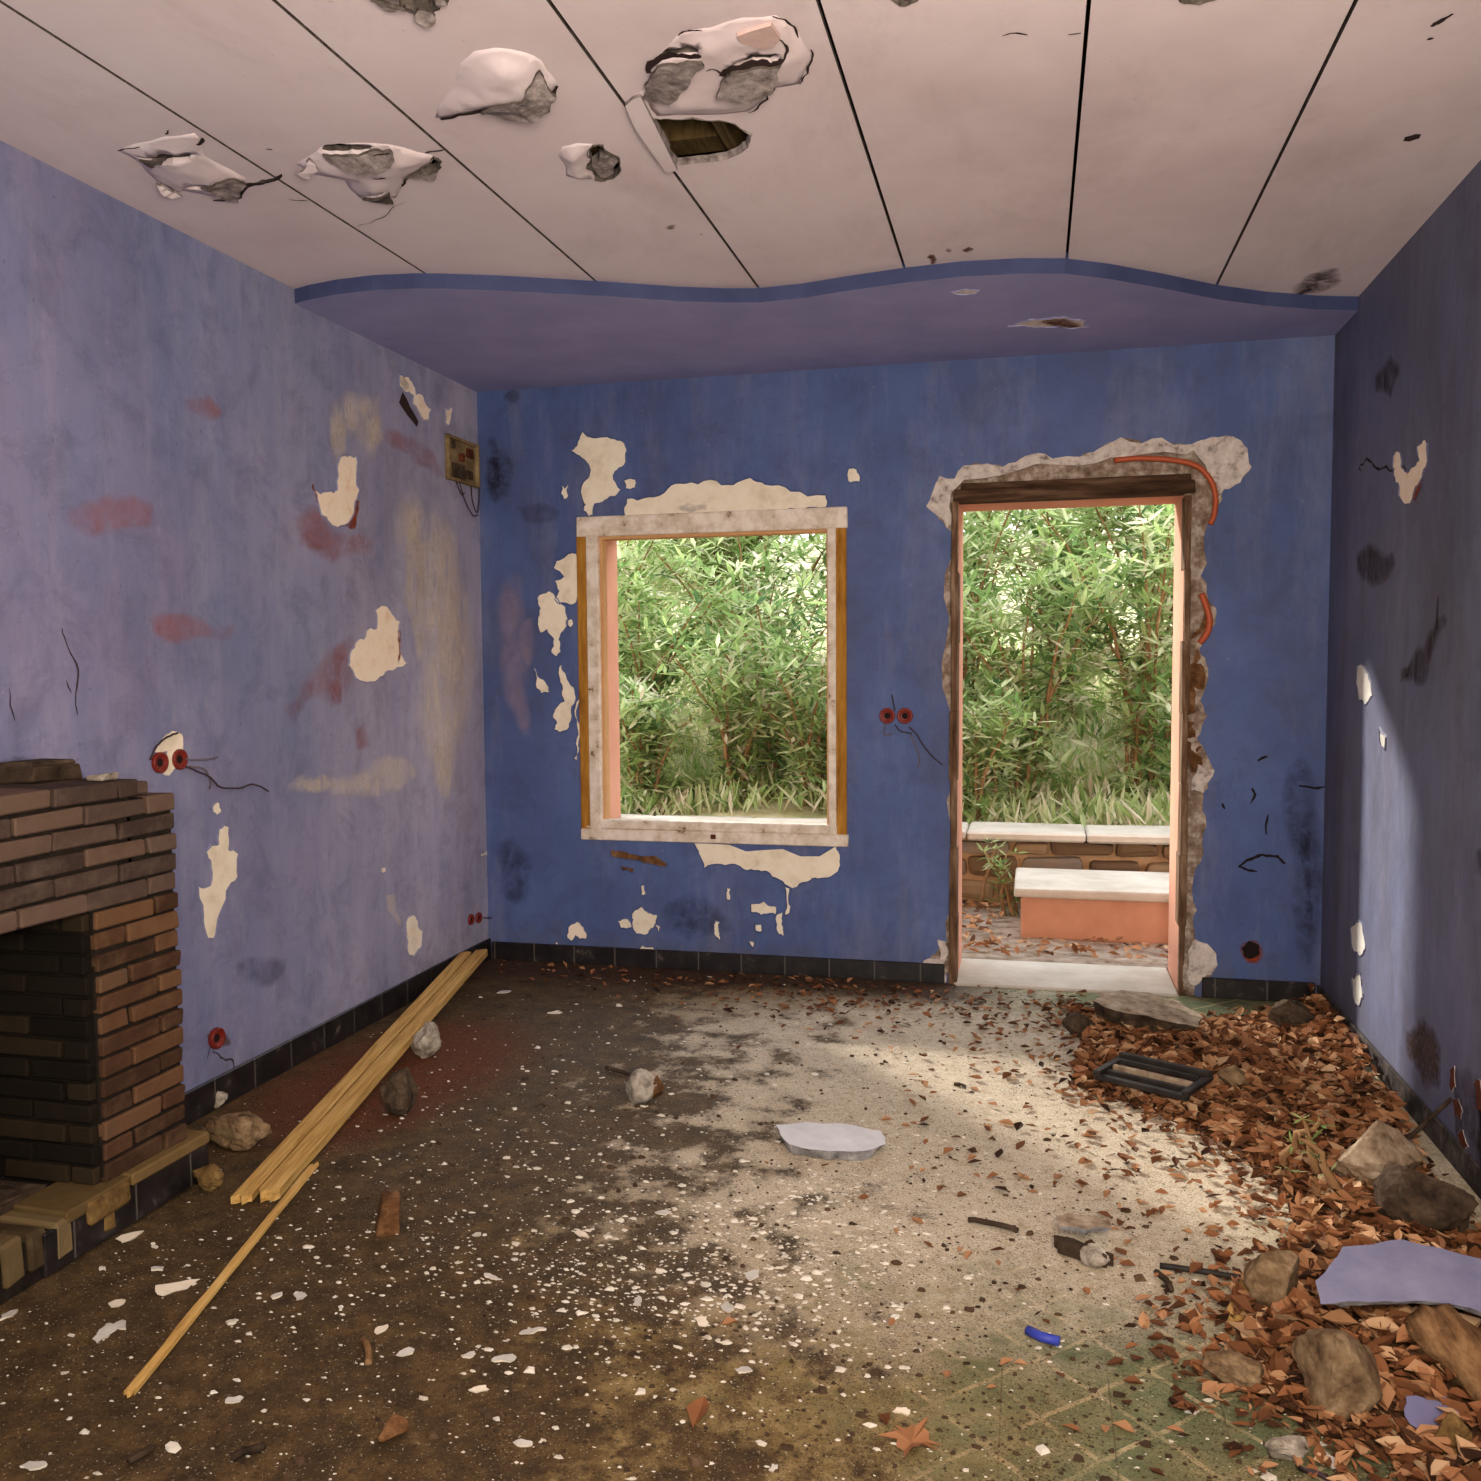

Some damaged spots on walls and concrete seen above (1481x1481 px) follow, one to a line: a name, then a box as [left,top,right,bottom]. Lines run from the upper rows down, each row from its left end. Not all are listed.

peeling [371,0,448,28]
peeling [312,454,360,529]
peeling [560,431,829,517]
peeling [1392,438,1429,506]
peeling [347,604,407,684]
peeling [533,551,580,761]
spalling [923,436,1251,995]
peeling [197,800,239,940]
peeling [694,843,842,949]